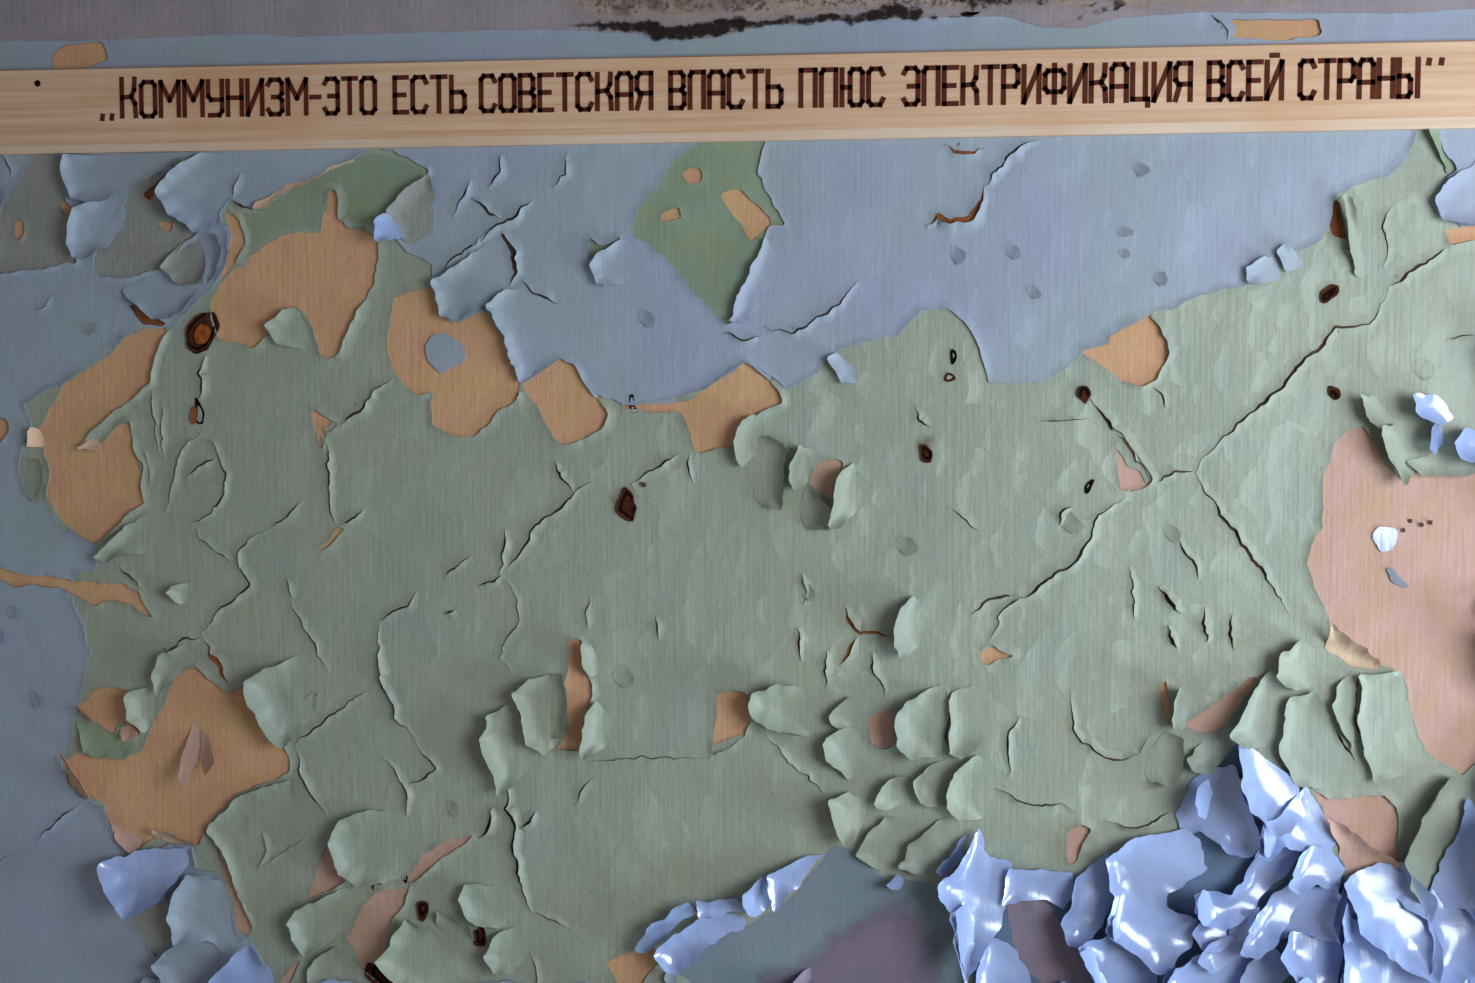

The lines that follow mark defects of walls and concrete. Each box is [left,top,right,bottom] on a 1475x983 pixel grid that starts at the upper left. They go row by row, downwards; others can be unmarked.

leakage [570,0,1107,41]
peeling [0,152,240,286]
peeling [580,141,789,331]
crack [966,205,1452,652]
crack [139,355,698,874]
crack [942,686,1175,835]
crack [1322,671,1365,765]
peeling [97,848,189,963]
peeling [141,874,235,983]
crack [478,734,830,983]
peeling [993,899,1094,983]
peeling [1167,831,1257,928]